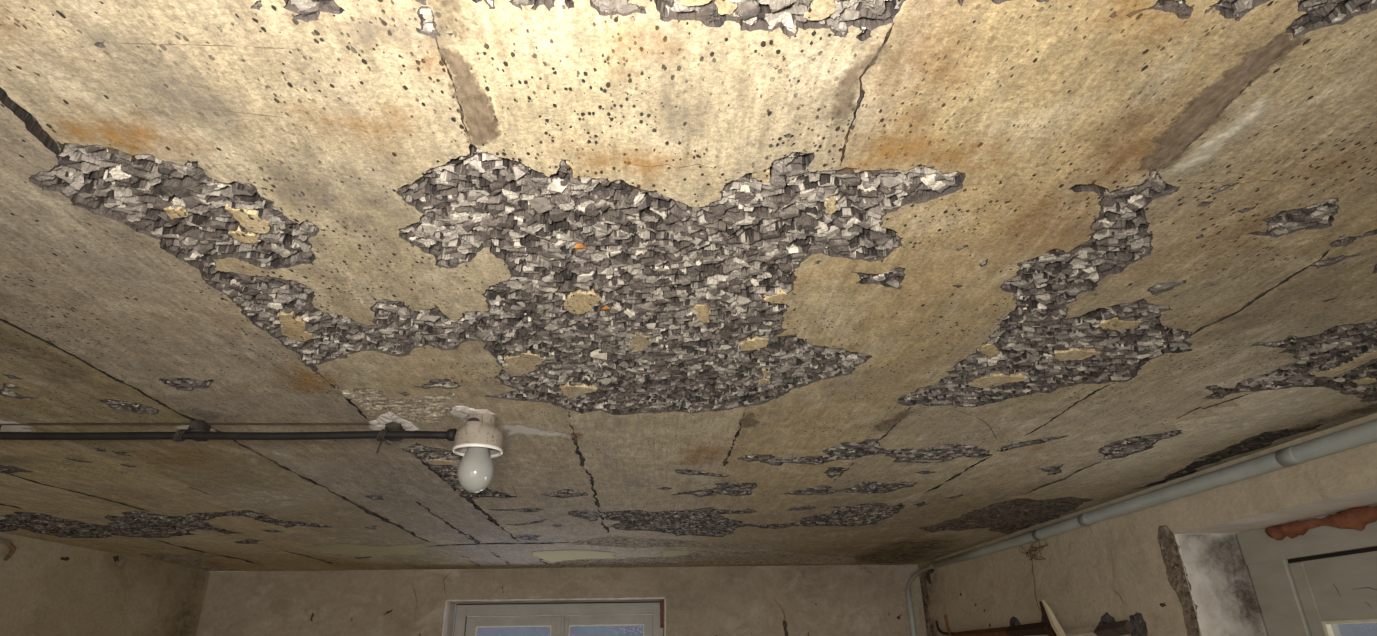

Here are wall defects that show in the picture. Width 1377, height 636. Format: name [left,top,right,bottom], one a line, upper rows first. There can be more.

spalling [283,0,345,22]
spalling [415,0,453,40]
spalling [472,0,906,41]
spalling [1109,0,1270,21]
spalling [1285,0,1377,39]
spalling [1237,198,1377,269]
spalling [28,133,966,415]
spalling [897,169,1193,407]
spalling [1203,319,1377,402]
spalling [332,378,460,423]
spalling [402,436,1067,568]
spalling [920,497,1094,535]